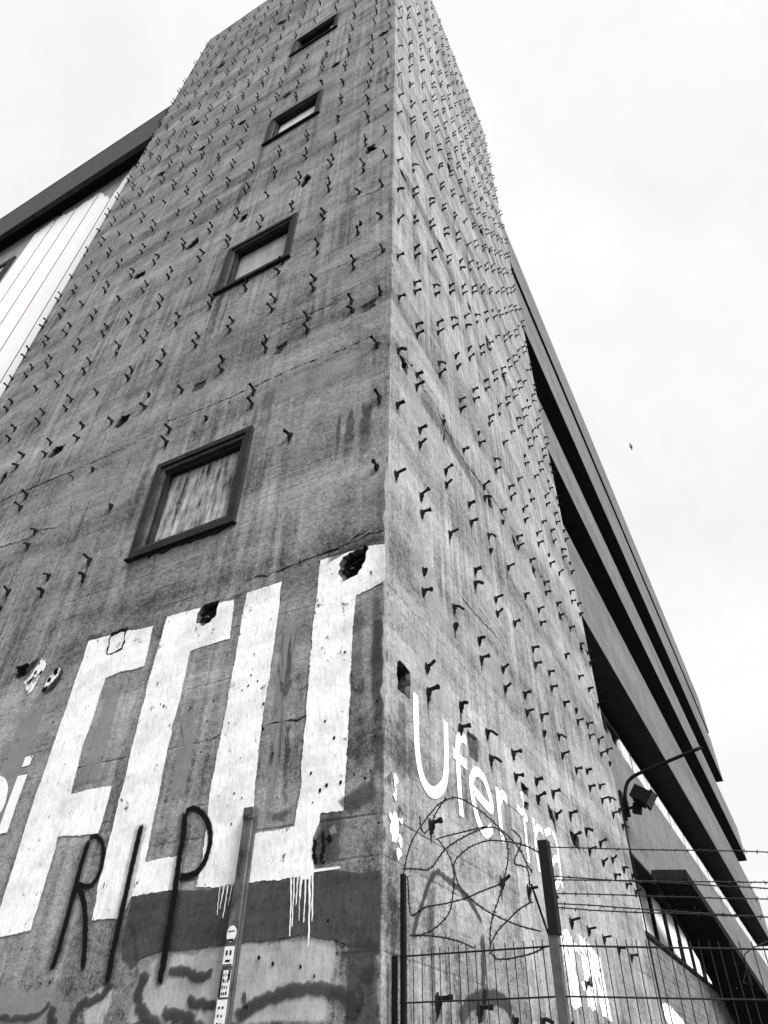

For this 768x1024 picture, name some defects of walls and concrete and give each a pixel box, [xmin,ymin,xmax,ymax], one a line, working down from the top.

damp [336,404,371,453]
crack [167,333,547,586]
spalling [329,536,376,581]
spalling [197,592,243,626]